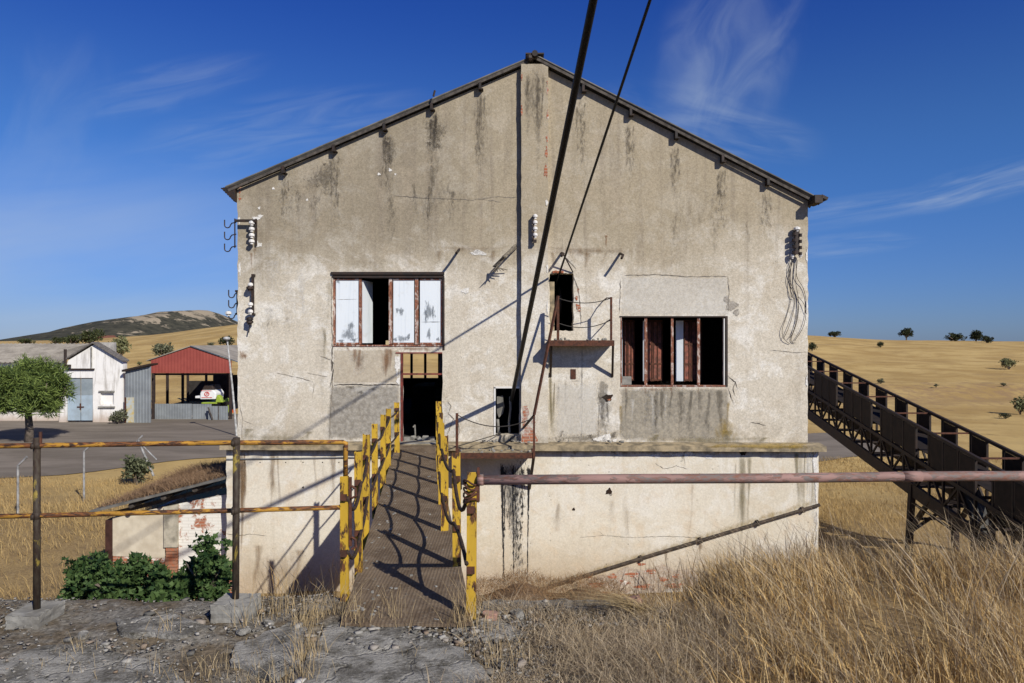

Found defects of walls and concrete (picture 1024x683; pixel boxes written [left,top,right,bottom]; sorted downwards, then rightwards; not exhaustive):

leakage [500,461,530,587]
flaking render [582,563,698,594]